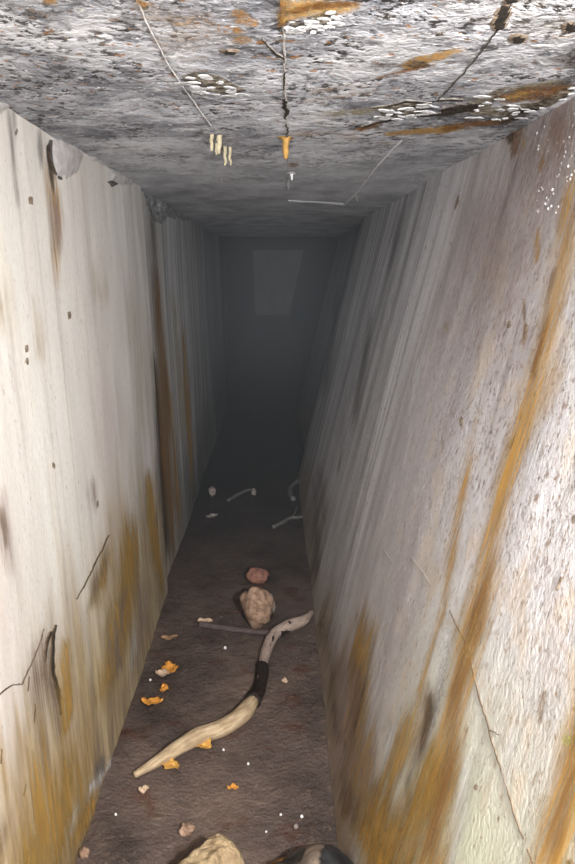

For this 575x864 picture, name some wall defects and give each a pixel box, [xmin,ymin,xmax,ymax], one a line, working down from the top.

rust [277,0,359,27]
flaking render [174,72,249,97]
crack [262,37,290,138]
flaking render [375,103,439,121]
rust [371,49,459,79]
crack [360,5,511,129]
rust [384,104,505,145]
leakage [463,50,575,278]
flaking render [464,84,575,121]
rust [418,180,575,864]
crack [0,629,44,723]
crack [449,610,534,864]